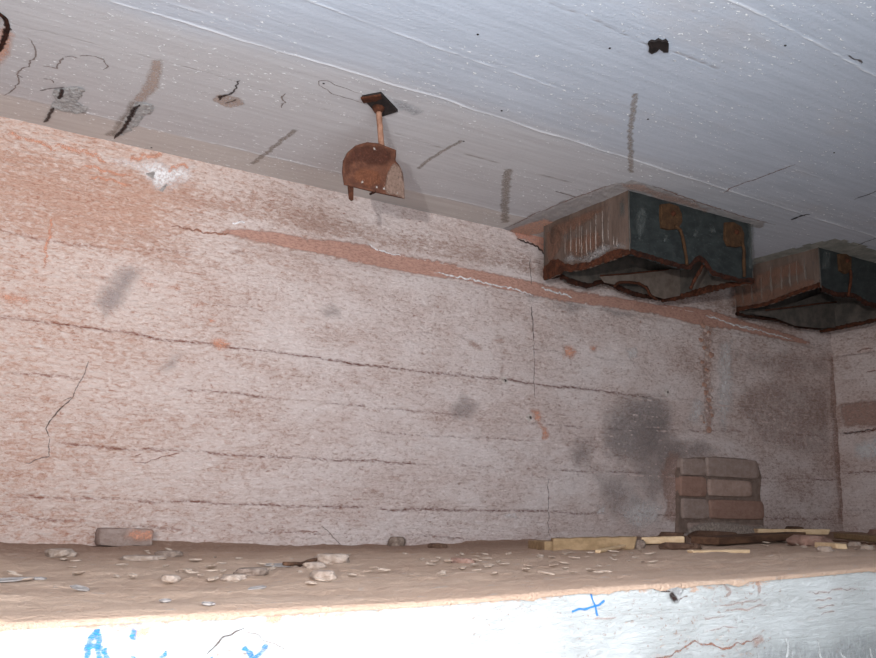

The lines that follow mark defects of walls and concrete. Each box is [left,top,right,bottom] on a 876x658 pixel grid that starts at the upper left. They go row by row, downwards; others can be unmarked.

spalling [0,13,12,60]
crack [4,38,109,96]
spalling [40,79,88,122]
spalling [114,102,155,139]
spalling [213,81,241,107]
crack [28,363,88,464]